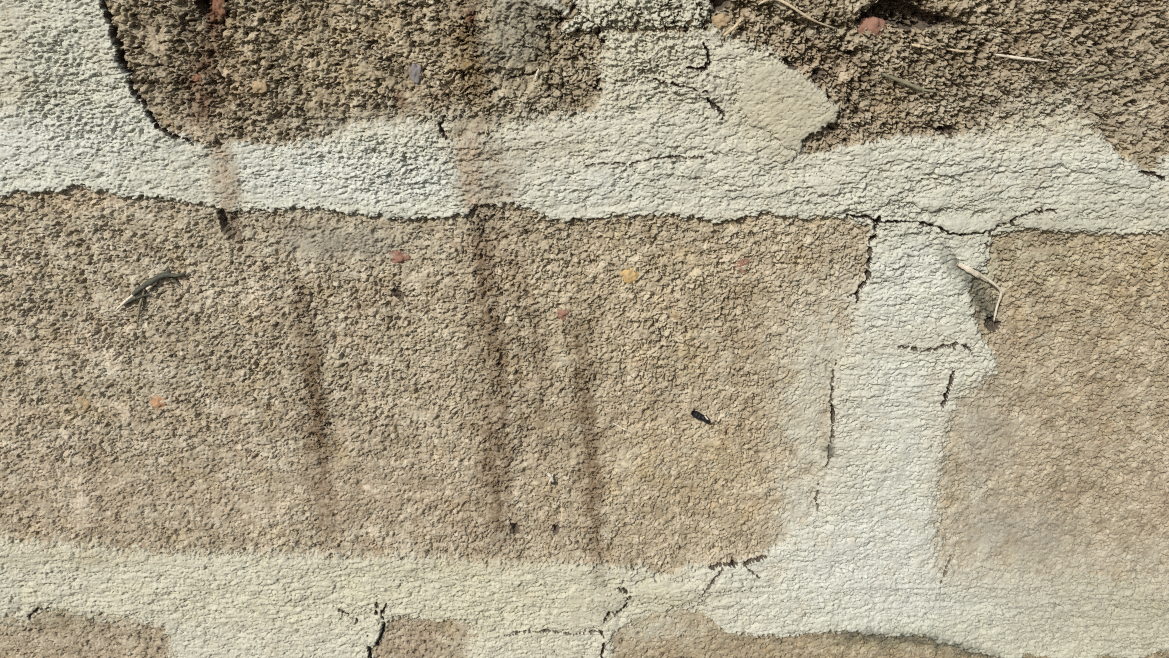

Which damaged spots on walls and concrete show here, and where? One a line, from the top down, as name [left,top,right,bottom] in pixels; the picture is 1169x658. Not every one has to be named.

spalling [194,0,213,18]
hole [855,0,952,30]
peeling [737,58,839,164]
spalling [929,124,955,139]
hole [216,207,242,242]
crack [846,208,1058,303]
spalling [984,315,1001,332]
crack [898,341,975,408]
crack [814,360,837,511]
crack [689,555,767,605]
crack [337,602,387,658]
crack [504,587,640,658]